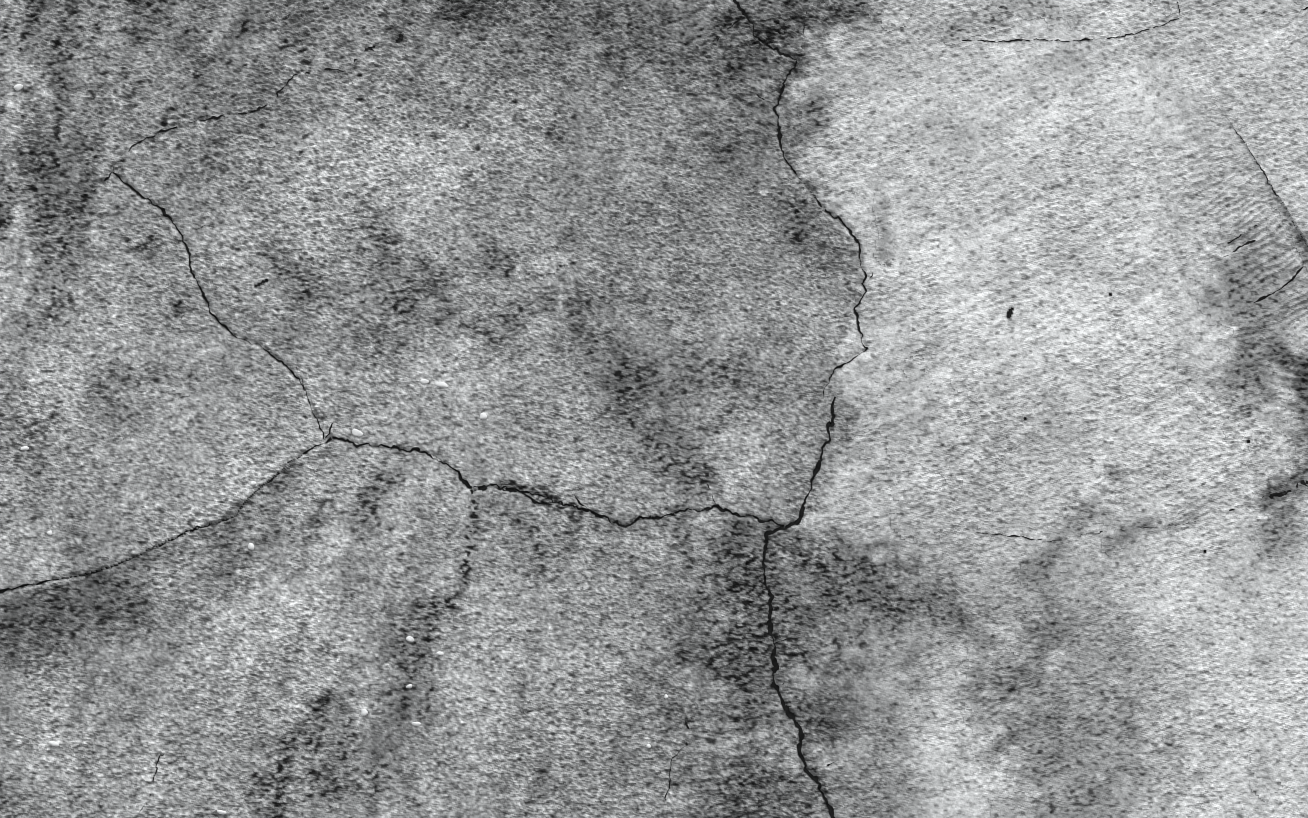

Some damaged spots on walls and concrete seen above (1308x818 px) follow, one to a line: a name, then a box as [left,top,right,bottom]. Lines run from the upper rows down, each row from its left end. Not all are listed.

crack [0,0,873,818]
crack [1224,225,1257,257]